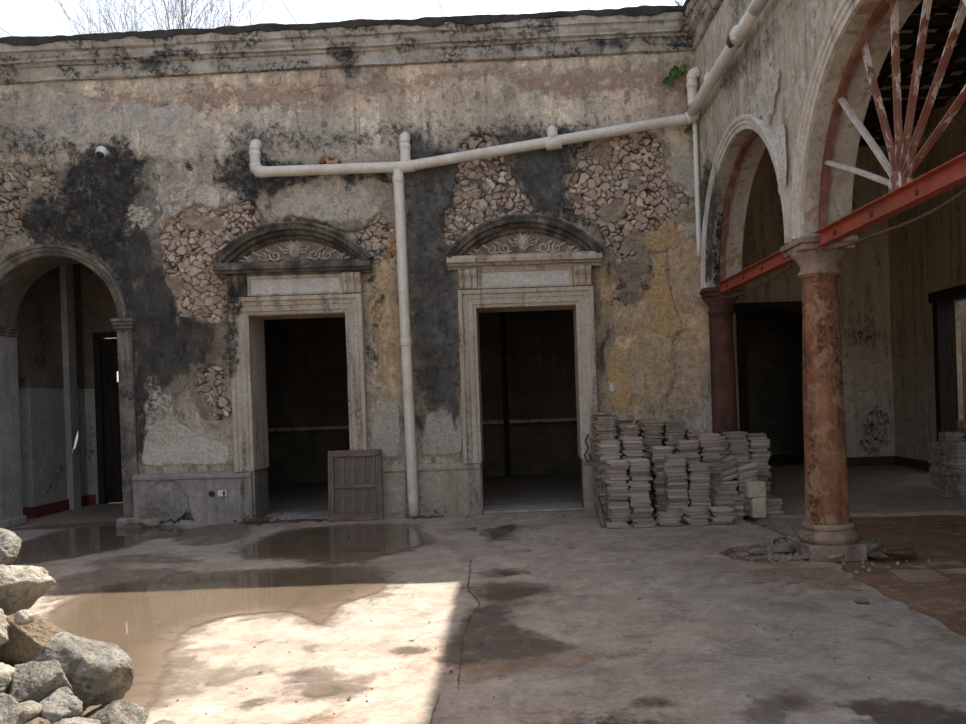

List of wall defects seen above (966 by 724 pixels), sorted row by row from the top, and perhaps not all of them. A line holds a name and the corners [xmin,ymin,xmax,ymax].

damp [0,125,243,460]
peeling [0,79,338,249]
flaking render [124,158,397,422]
damp [213,120,599,431]
flaking render [443,134,535,245]
crack [430,560,557,724]